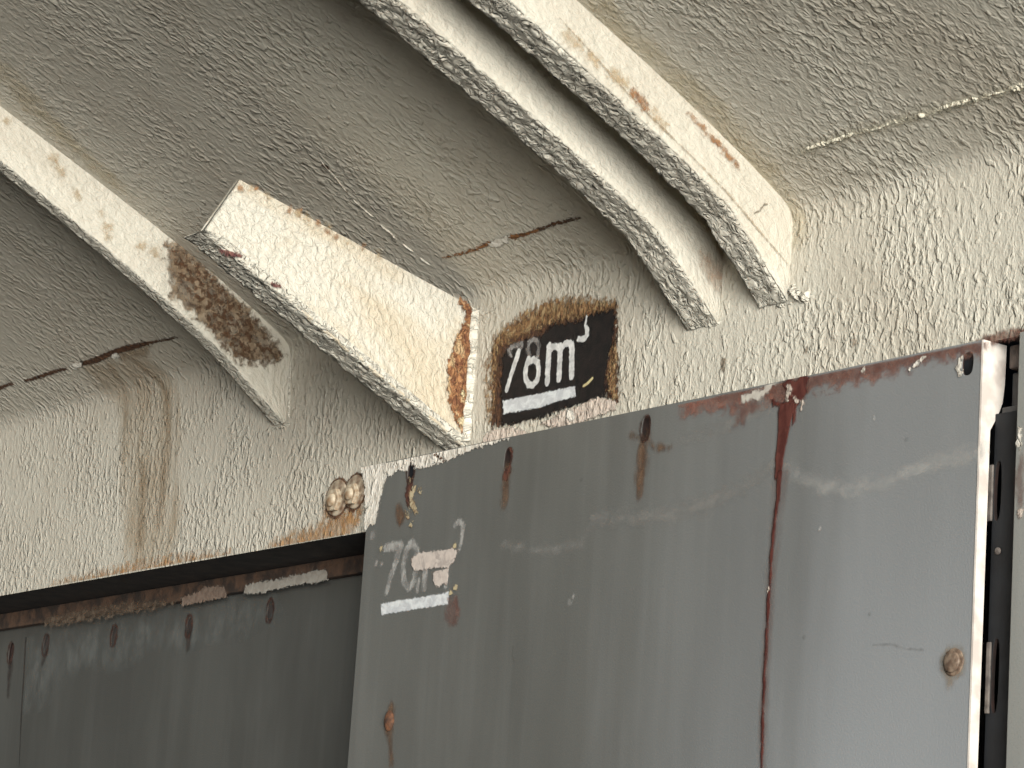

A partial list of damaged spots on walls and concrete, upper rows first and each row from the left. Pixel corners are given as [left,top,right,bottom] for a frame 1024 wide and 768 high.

crack [442,217,581,258]
corrosion [154,242,283,367]
crack [0,336,178,390]
corrosion [484,294,619,430]
peeling [540,396,616,427]
corrosion [274,472,365,547]
corrosion [396,463,422,528]
peeling [360,426,527,531]
corrosion [502,447,513,502]
corrosion [637,415,665,496]